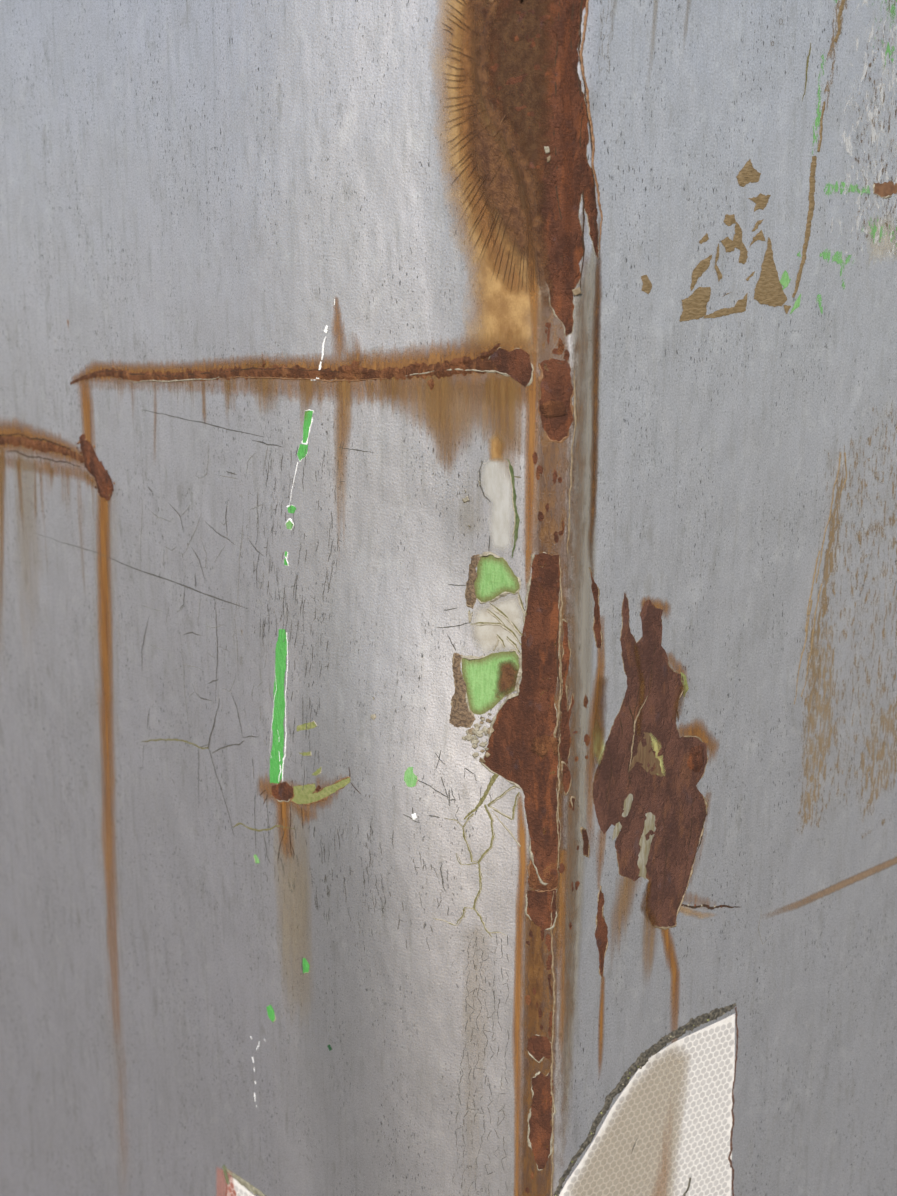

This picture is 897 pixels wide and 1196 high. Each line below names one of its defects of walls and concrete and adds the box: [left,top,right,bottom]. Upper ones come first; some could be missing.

peeling [679,159,791,322]
peeling [820,0,897,289]
damp [74,303,539,477]
rust [78,381,113,914]
peeling [438,535,527,763]
rust [443,0,722,1196]
crack [35,410,521,1196]